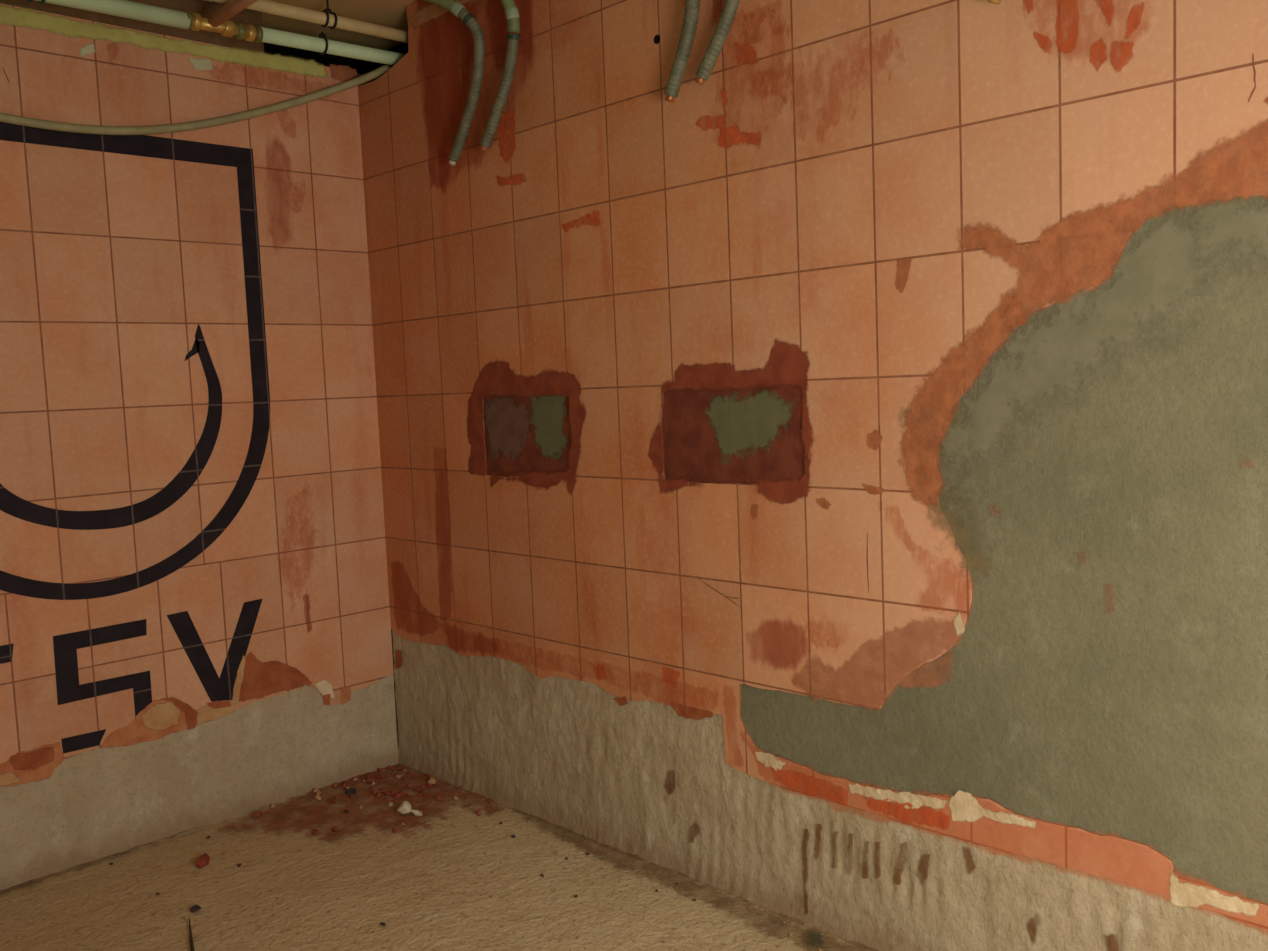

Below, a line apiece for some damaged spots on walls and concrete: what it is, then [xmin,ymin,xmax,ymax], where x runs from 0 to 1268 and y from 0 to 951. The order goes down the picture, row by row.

spalling [467,361,586,494]
spalling [648,339,813,504]
spalling [741,120,1268,916]
spalling [0,630,1268,951]